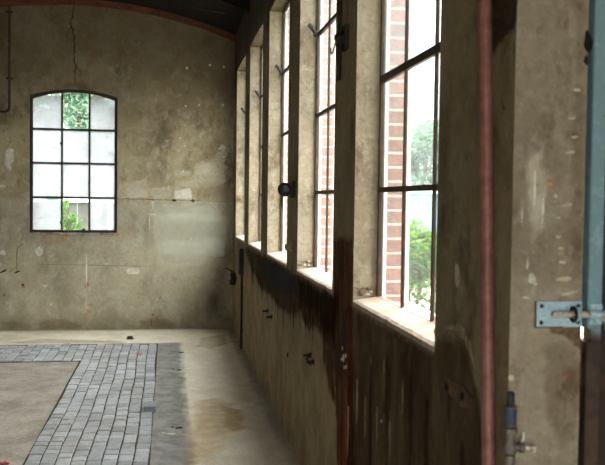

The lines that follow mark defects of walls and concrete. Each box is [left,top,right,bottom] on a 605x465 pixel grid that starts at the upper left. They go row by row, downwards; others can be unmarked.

crack [66,5,82,82]